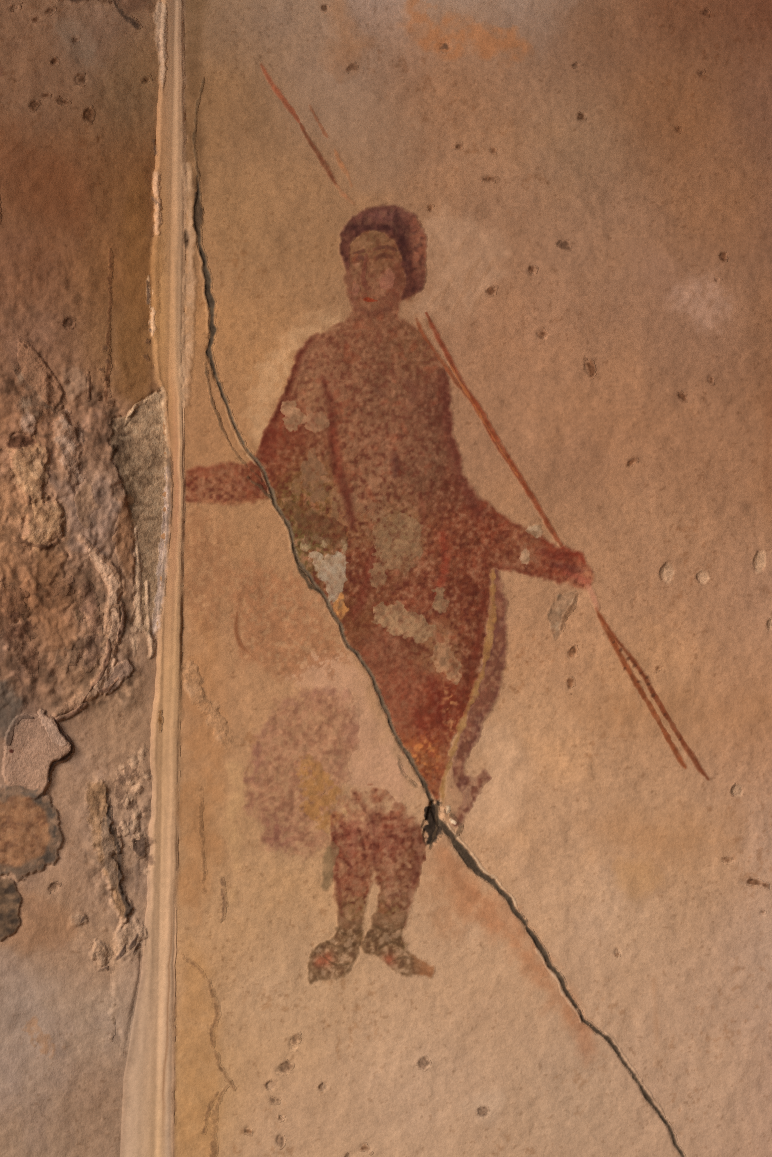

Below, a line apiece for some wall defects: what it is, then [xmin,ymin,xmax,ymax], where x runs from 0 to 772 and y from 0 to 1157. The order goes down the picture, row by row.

peeling [0,338,173,799]
crack [182,77,686,1157]
spalling [48,880,61,894]
spalling [84,743,157,971]